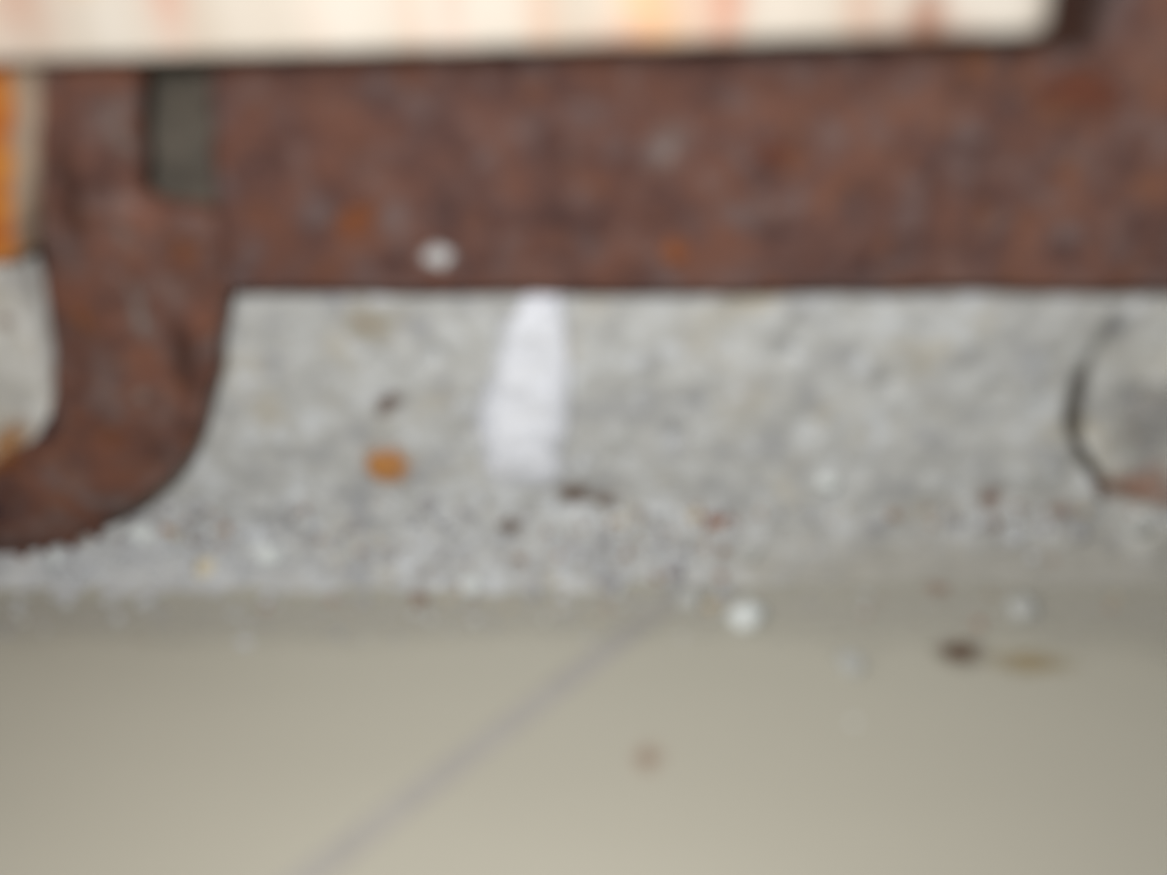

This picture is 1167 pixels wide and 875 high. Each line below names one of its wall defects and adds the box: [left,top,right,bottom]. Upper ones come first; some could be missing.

leakage [477,290,568,484]
crack [1065,366,1138,501]
corrosion [367,450,406,482]
corrosion [562,487,611,505]
corrosion [943,643,973,660]